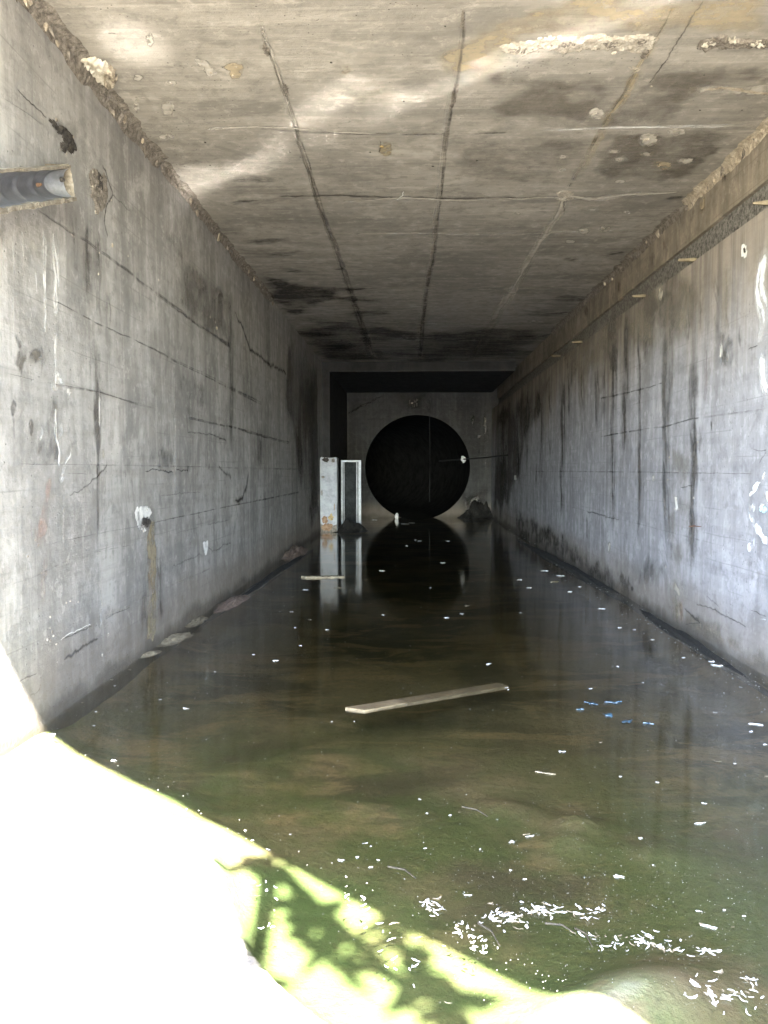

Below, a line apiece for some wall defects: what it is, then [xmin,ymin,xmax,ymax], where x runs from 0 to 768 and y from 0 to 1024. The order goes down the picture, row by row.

spalling [16,0,274,306]
water stain [268,271,387,315]
water stain [300,322,533,362]
crack [281,114,682,293]
water stain [500,83,596,118]
water stain [471,302,656,508]
peeling [443,0,768,72]
water stain [602,135,666,175]
crack [593,2,703,142]
spalling [551,117,768,335]
water stain [638,342,698,555]
water stain [518,515,633,590]